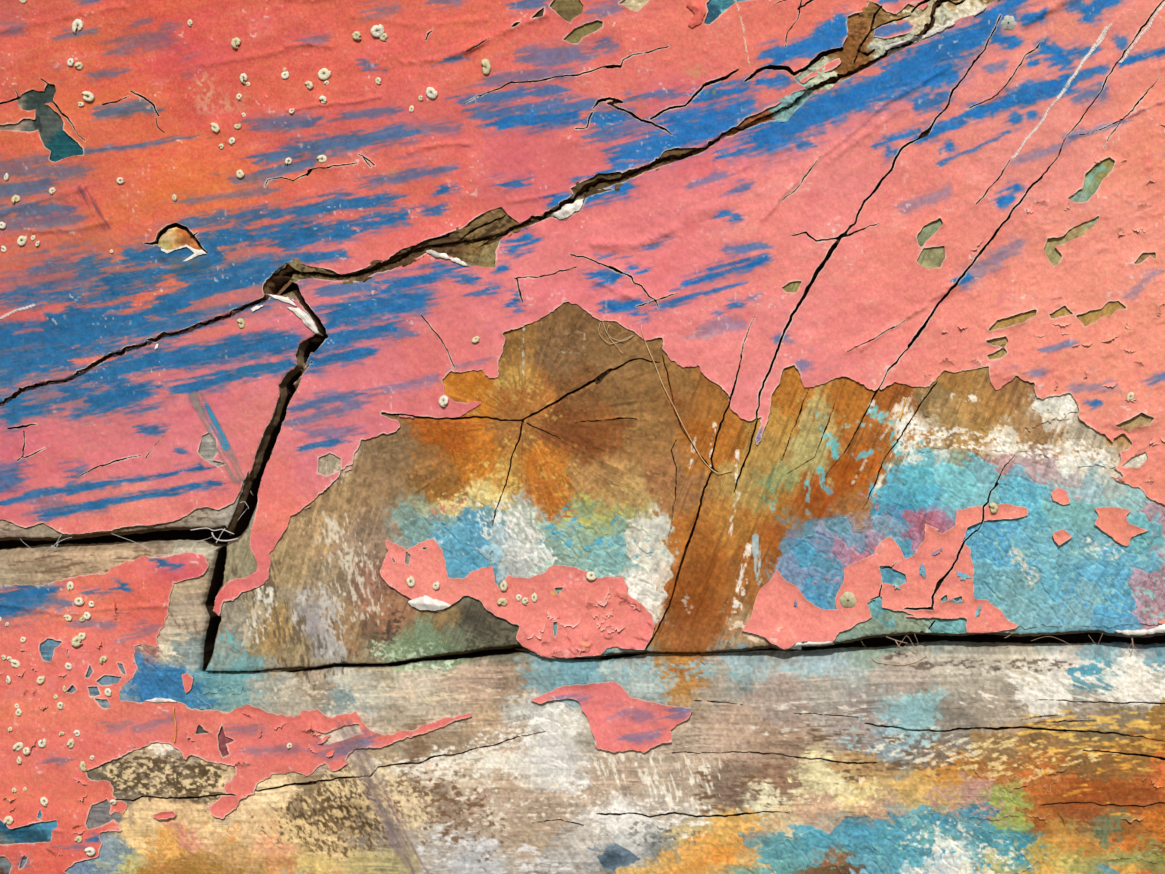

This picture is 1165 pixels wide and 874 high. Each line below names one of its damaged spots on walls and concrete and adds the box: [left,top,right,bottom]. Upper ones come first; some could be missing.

peeling [0,83,83,162]
crack [0,0,965,459]
crack [783,0,1164,476]
crack [384,16,1044,649]
crack [81,454,149,475]
peeling [0,297,1165,874]
crack [672,751,877,764]
crack [797,699,1165,760]
crack [533,811,788,826]